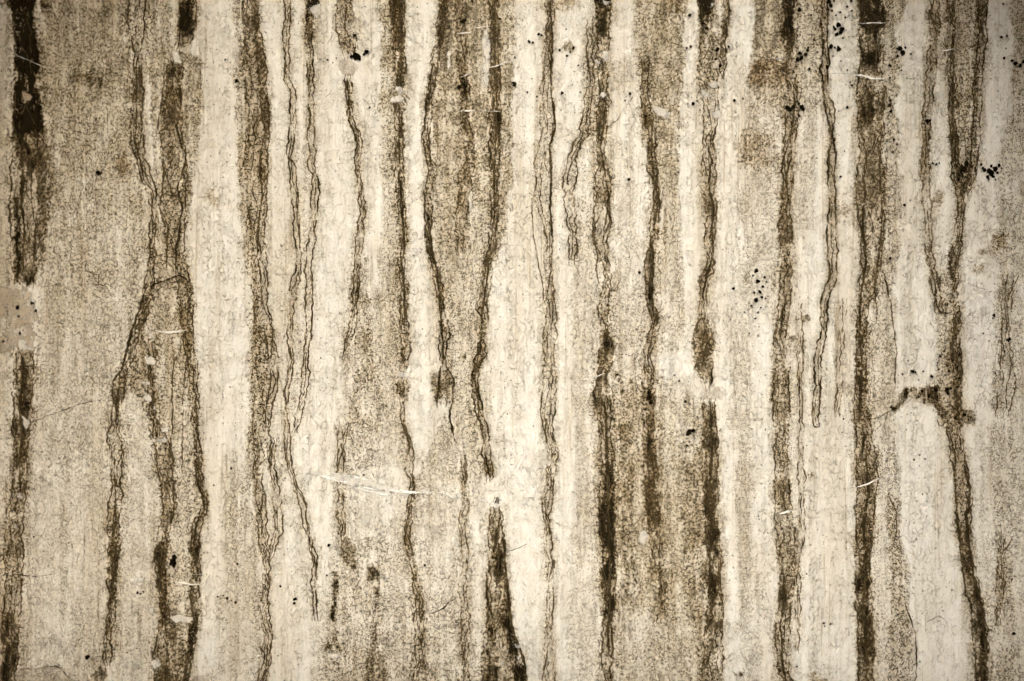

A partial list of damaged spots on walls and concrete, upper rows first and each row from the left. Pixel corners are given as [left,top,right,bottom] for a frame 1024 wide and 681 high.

water stain [0,0,731,681]
water stain [733,0,1024,681]